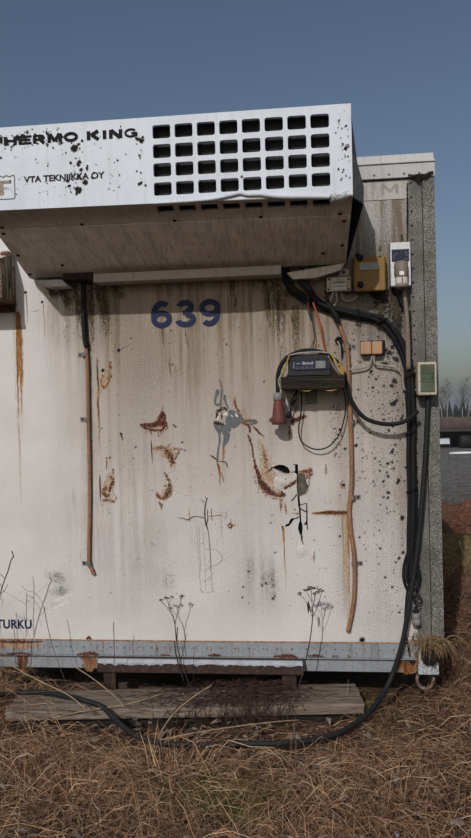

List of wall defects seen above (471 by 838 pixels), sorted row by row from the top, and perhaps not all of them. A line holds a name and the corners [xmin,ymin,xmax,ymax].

rust [15,312,23,412]
rust [96,360,113,438]
rust [99,456,117,505]
rust [140,408,187,510]
rust [234,397,313,514]
rust [0,639,44,672]
rust [77,643,104,671]